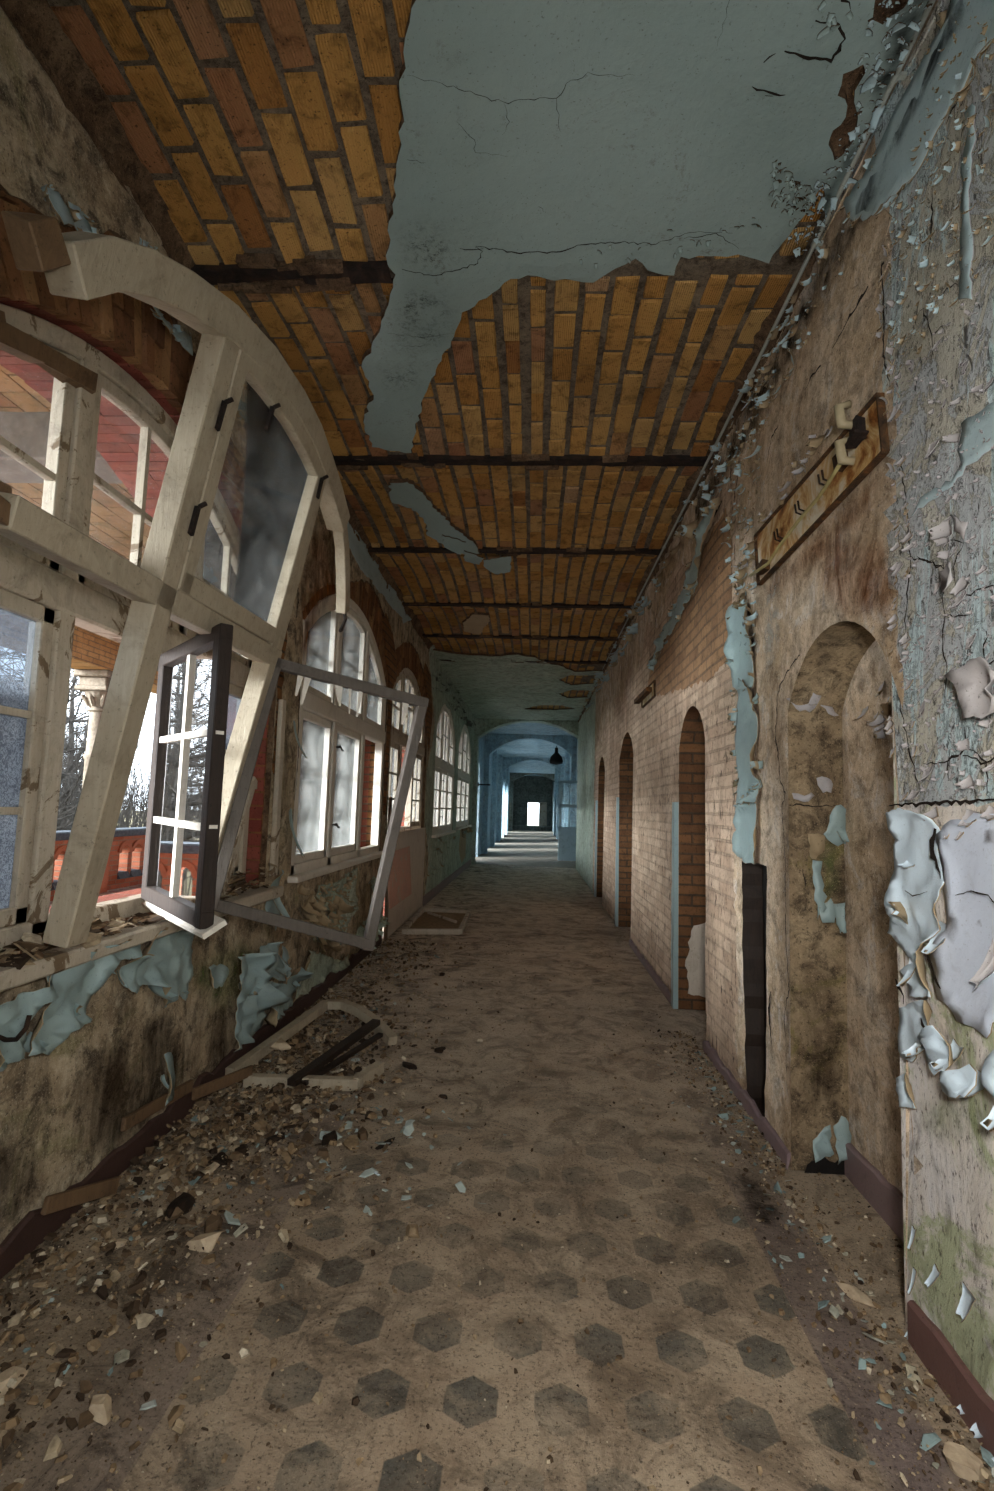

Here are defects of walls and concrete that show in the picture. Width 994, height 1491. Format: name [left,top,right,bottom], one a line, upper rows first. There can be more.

crack [752,0,851,96]
peeling [442,534,512,574]
peeling [583,0,994,1132]
peeling [0,868,390,1072]
peeling [160,1052,175,1106]
peeling [804,1116,851,1175]
peeling [907,1226,941,1295]
peeling [956,1282,976,1322]
peeling [956,1405,983,1438]